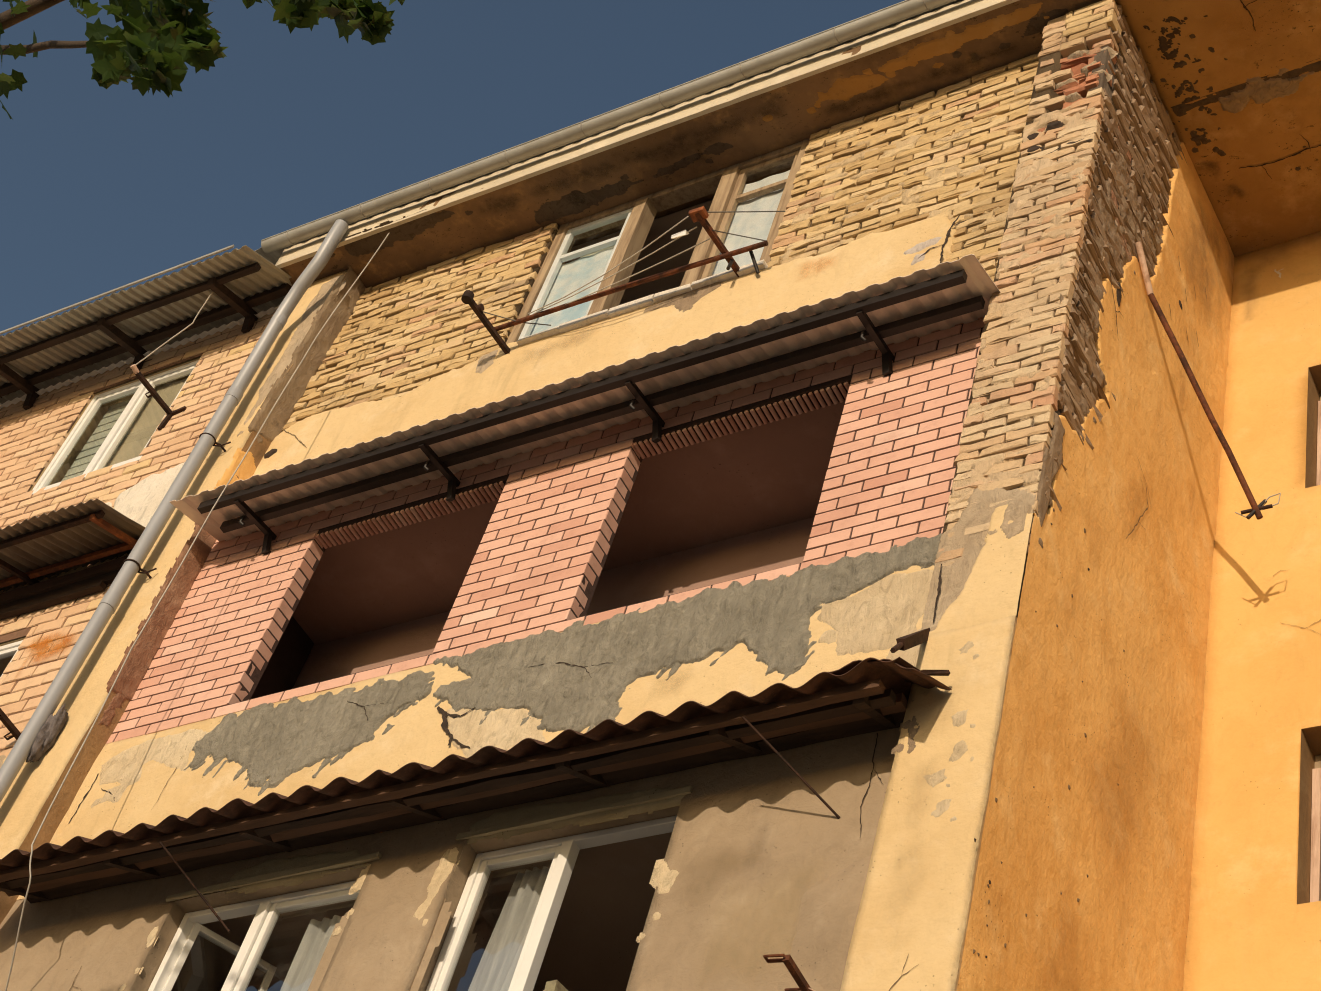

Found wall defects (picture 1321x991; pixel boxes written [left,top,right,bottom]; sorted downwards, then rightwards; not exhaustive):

crack [1240,135,1321,179]
flaking render [988,5,1228,548]
crack [1126,462,1151,539]
spalling [98,523,217,727]
peeling [817,569,933,667]
peeling [91,729,209,808]
spalling [447,708,546,758]
crack [860,733,883,836]
spalling [891,716,920,755]